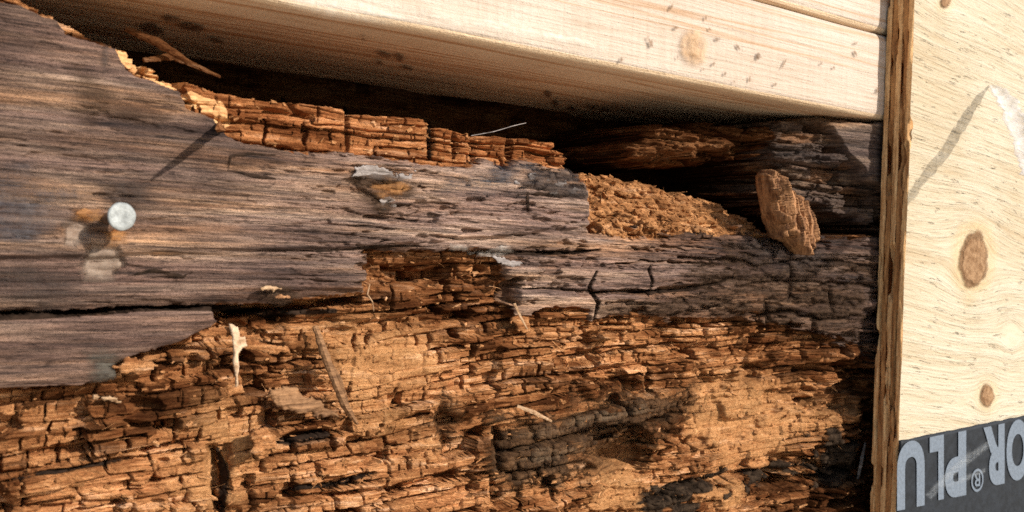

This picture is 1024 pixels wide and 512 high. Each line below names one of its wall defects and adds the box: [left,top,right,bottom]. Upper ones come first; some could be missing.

spalling [117,49,772,241]
crack [0,304,337,320]
peeling [260,285,298,303]
spalling [364,245,522,324]
crack [474,249,726,320]